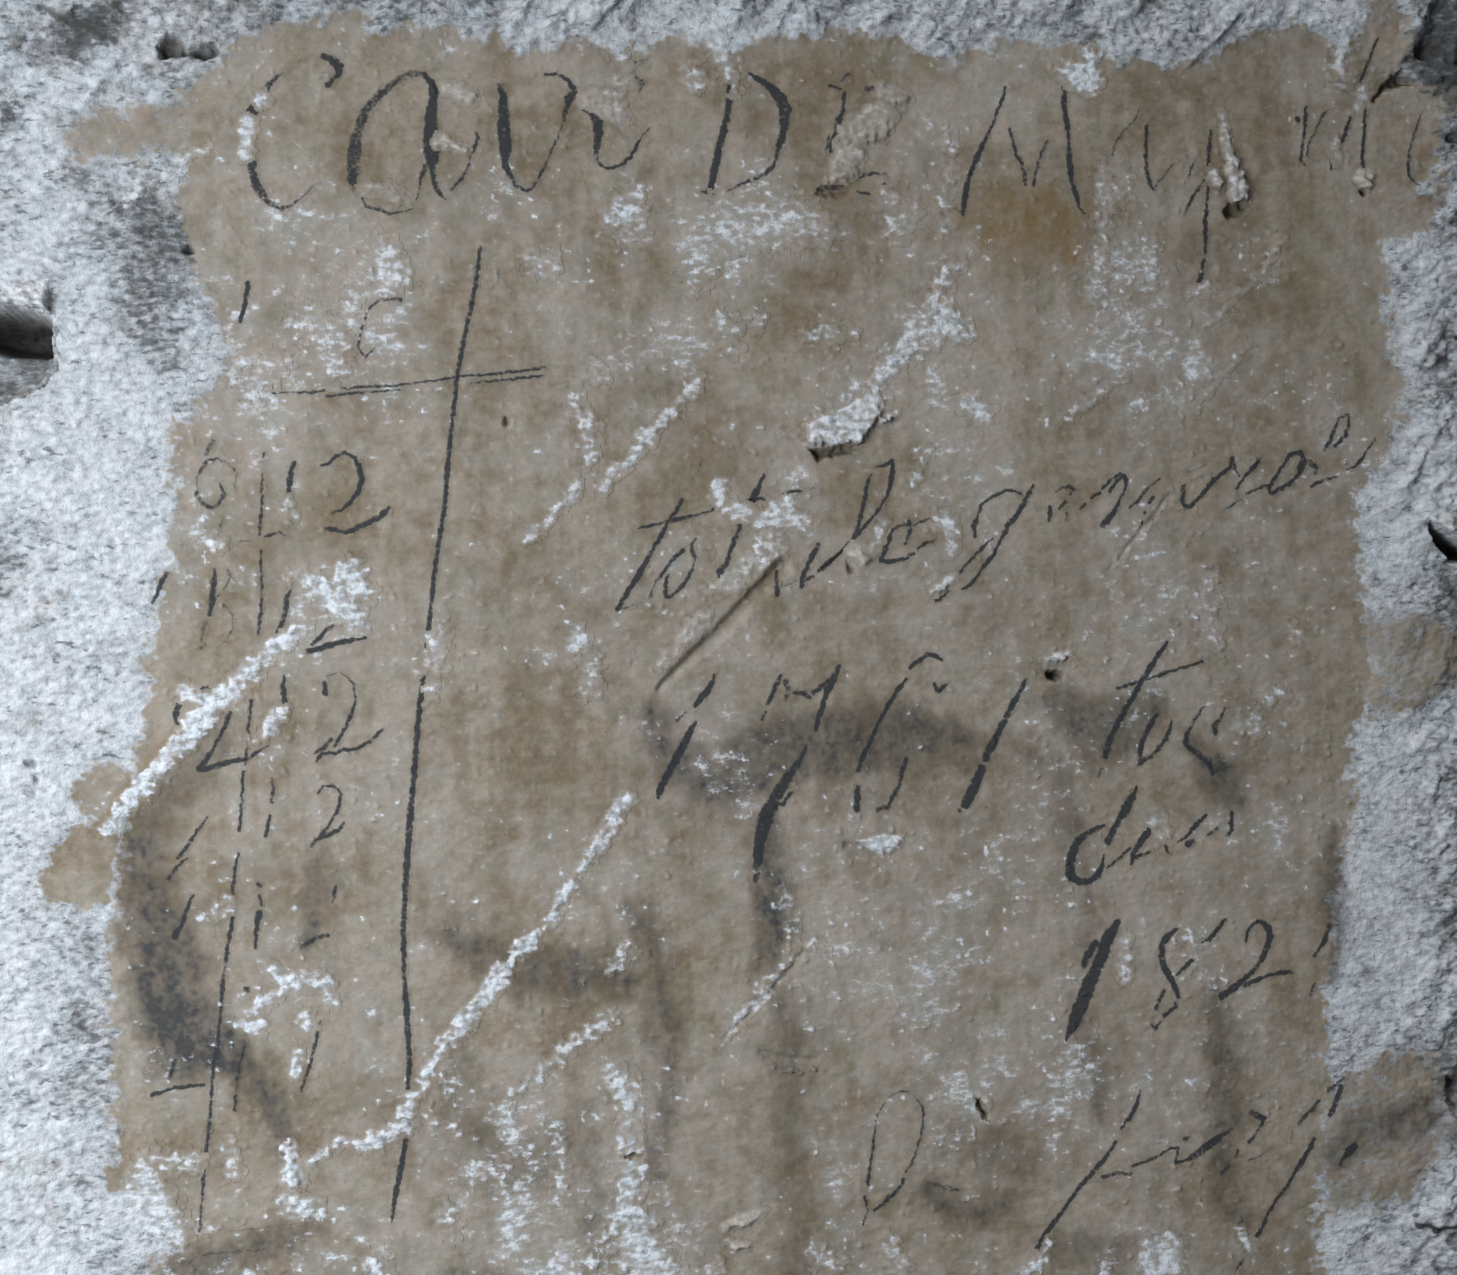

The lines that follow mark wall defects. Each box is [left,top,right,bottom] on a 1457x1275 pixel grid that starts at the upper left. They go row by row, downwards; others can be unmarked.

peeling [354,79,427,210]
spalling [1351,165,1377,193]
peeling [1404,155,1457,224]
peeling [226,345,301,403]
crack [0,586,15,599]
damp [104,713,245,881]
spalling [95,617,317,840]
peeling [22,830,208,1211]
damp [110,896,309,1173]
peeling [271,787,650,1275]
damp [419,904,659,1022]
peeling [165,1084,281,1241]